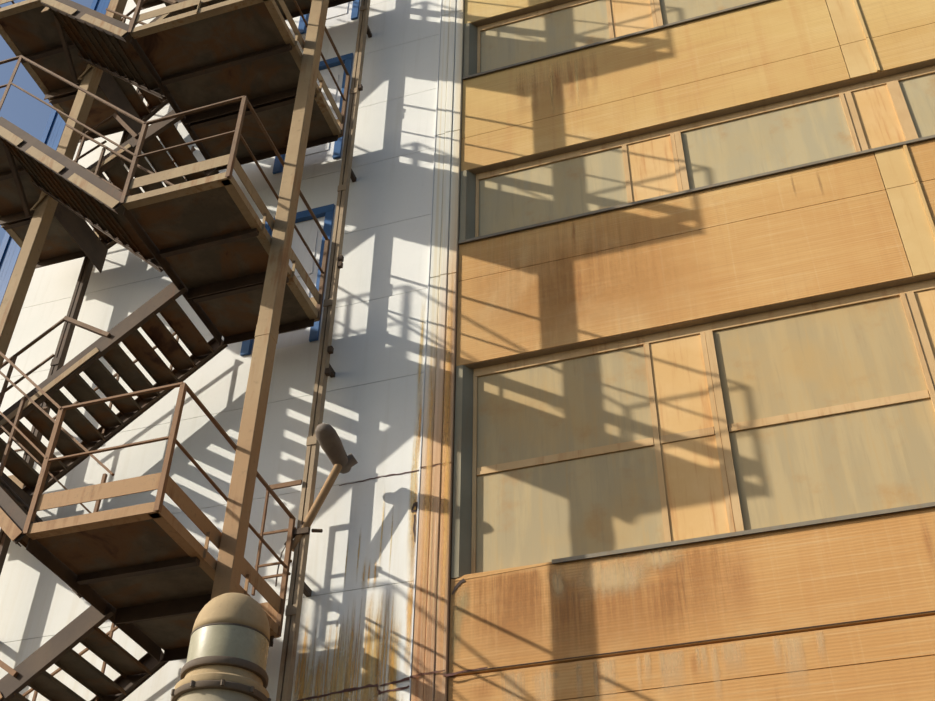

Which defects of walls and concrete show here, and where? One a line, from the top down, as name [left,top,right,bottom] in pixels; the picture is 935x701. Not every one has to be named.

crack [339,462,449,486]
water stain [583,549,673,589]
corrosion [295,620,396,701]